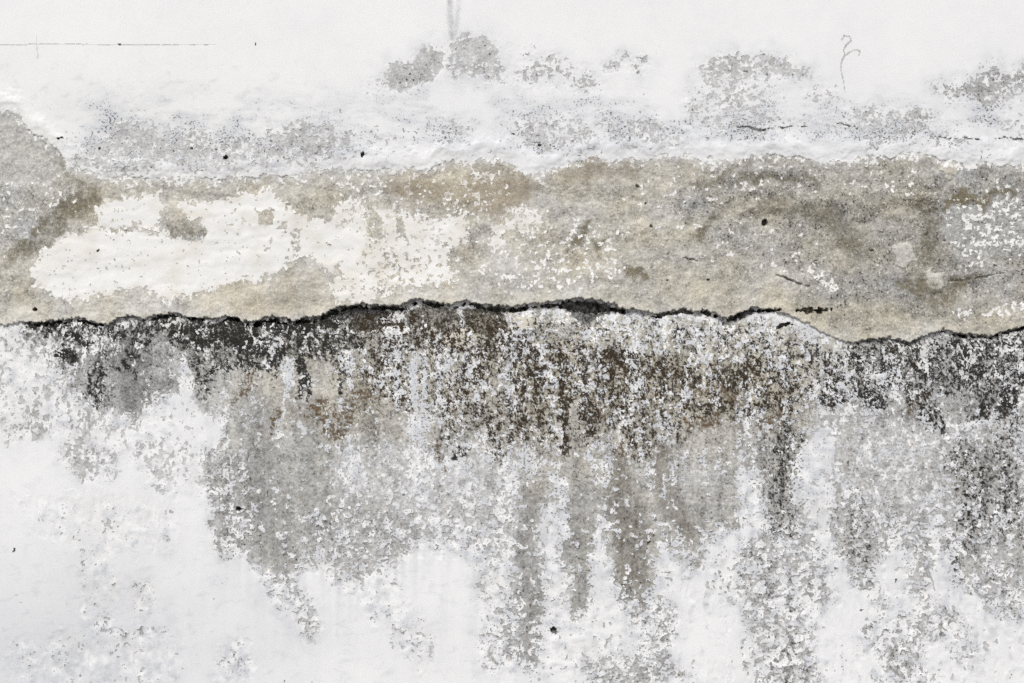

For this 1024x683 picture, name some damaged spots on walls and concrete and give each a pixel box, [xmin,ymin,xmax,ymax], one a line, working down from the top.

peeling [0,112,404,213]
peeling [495,108,702,230]
crack [24,274,833,330]
crack [855,325,1024,346]
peeling [0,166,1024,683]
damp [23,303,1024,571]